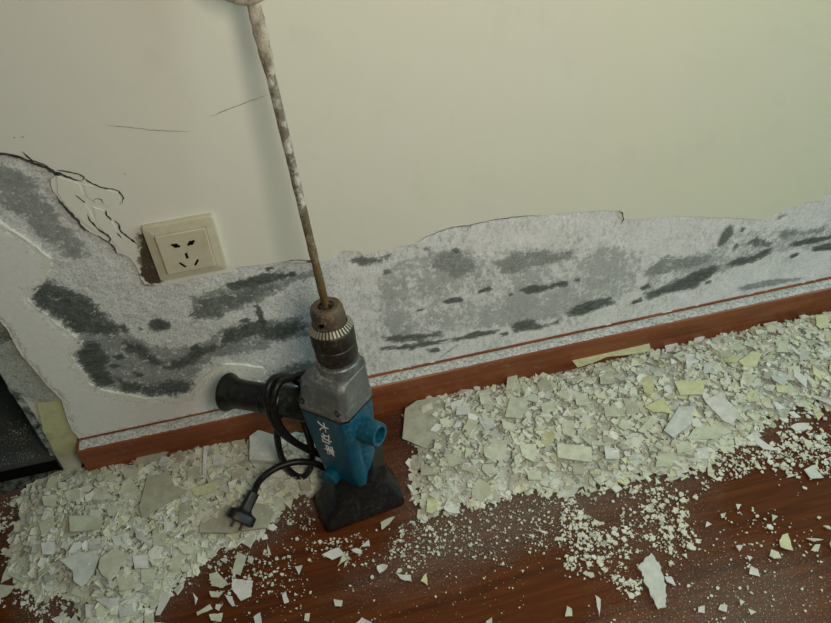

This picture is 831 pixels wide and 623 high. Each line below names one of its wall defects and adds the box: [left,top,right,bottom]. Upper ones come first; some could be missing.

crack [0,152,139,253]
damp [137,234,161,286]
damp [32,261,314,398]
peeling [0,155,831,438]
damp [351,225,831,352]
spalling [6,381,56,456]
peeling [402,396,444,448]